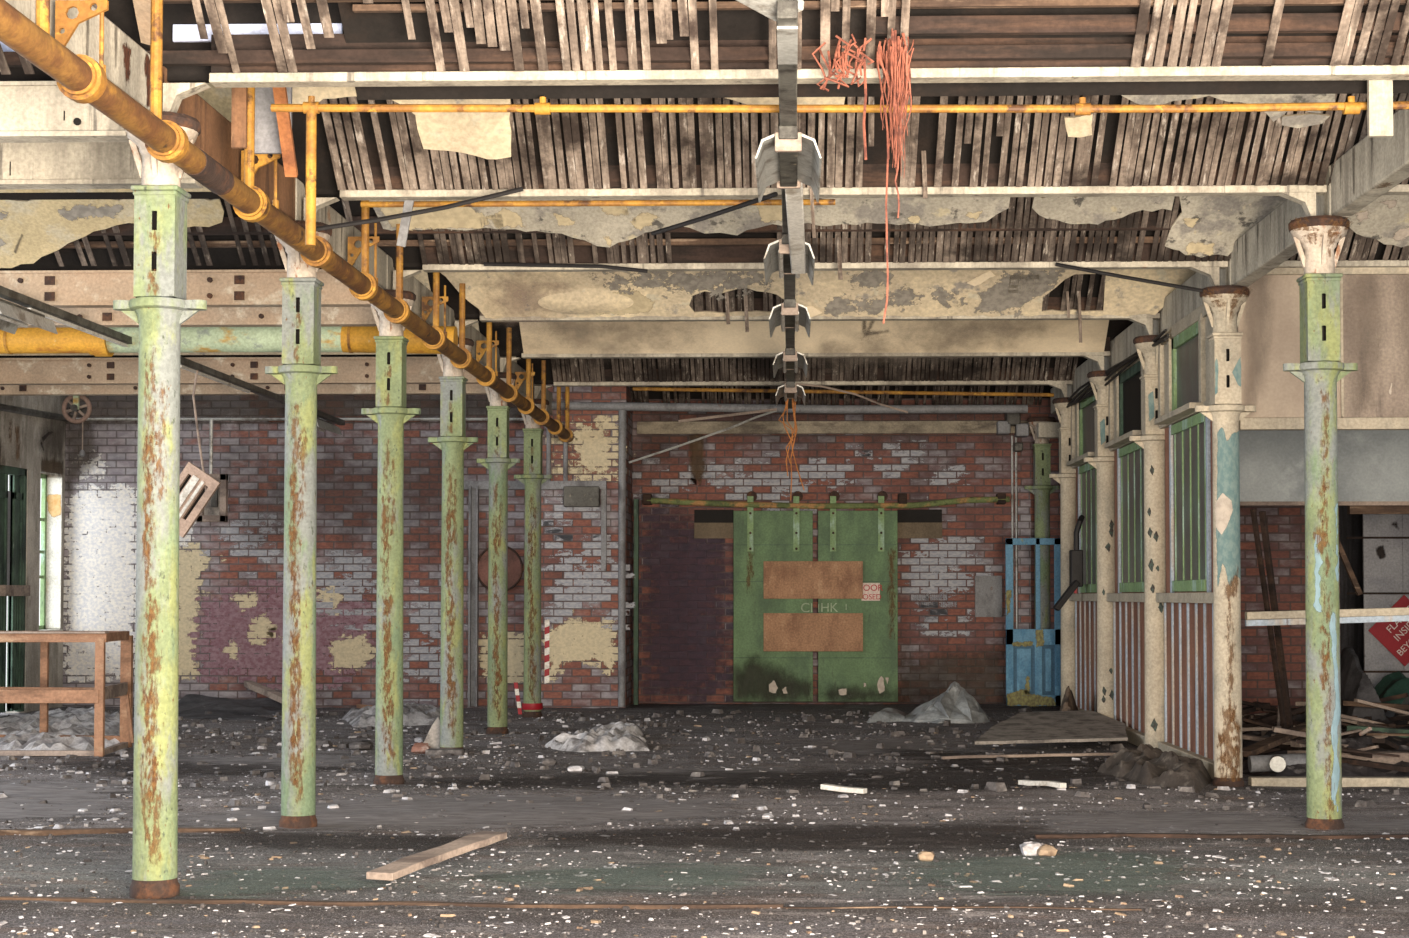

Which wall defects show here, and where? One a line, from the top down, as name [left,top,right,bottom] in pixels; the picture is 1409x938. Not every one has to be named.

peeling [0,199,134,268]
peeling [187,199,224,227]
peeling [393,99,512,159]
peeling [369,198,782,248]
peeling [440,196,1287,319]
peeling [63,449,137,683]
rust [140,348,168,862]
peeling [179,522,283,694]
rust [288,405,307,803]
rust [380,442,397,760]
rust [444,463,458,737]
rust [1313,390,1334,821]